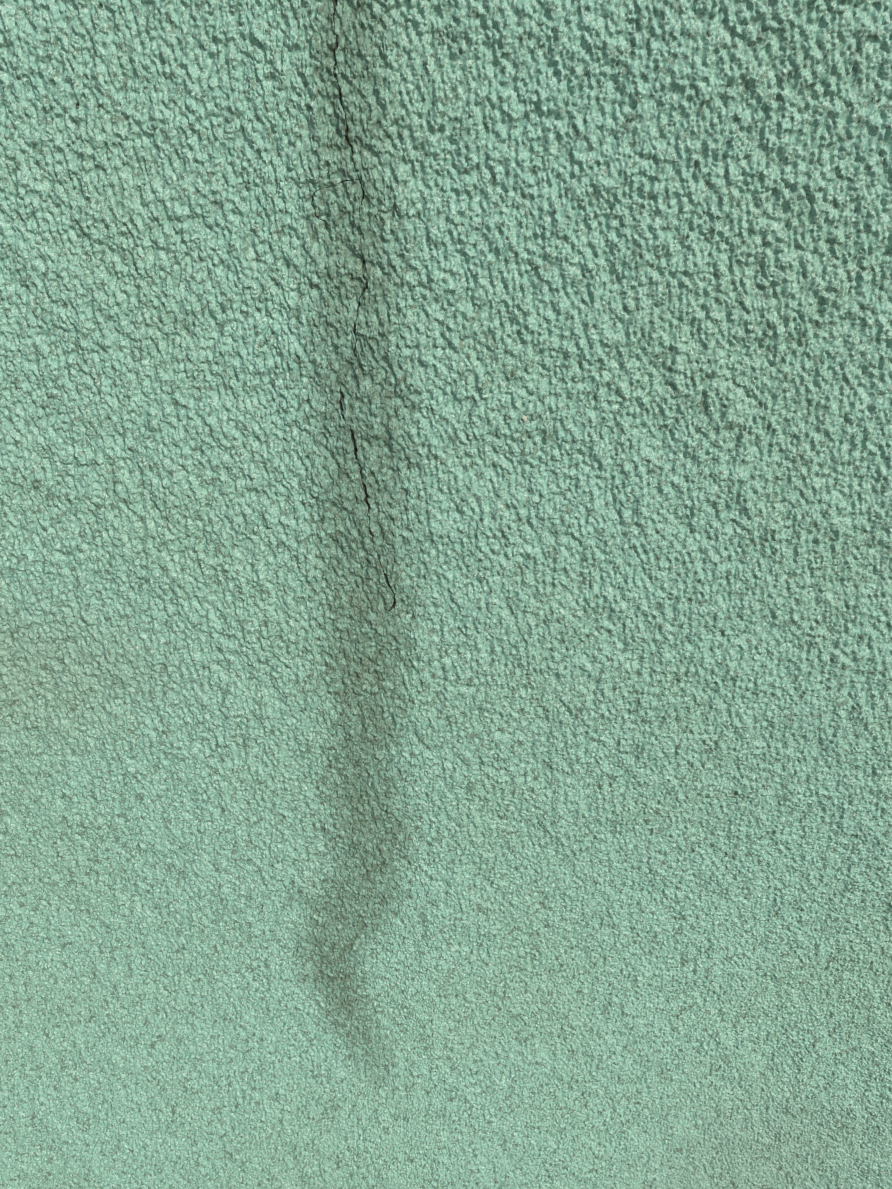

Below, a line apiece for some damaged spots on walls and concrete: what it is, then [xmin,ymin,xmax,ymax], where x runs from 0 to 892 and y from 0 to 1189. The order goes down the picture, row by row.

crack [311,0,395,612]